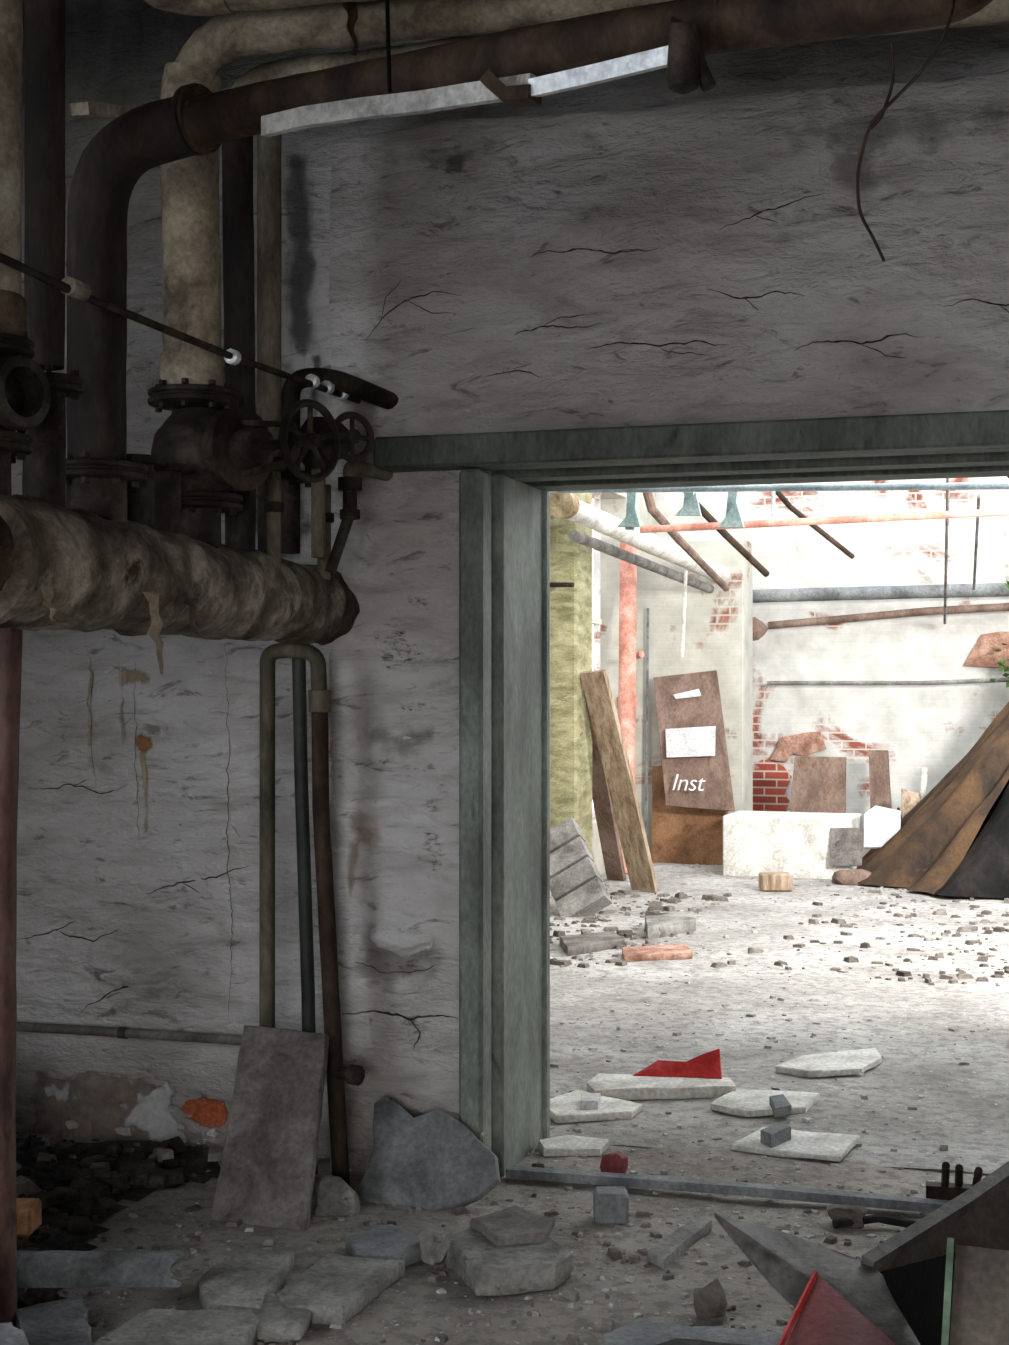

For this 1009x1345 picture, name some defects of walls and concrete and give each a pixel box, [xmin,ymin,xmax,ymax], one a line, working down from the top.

crack [719,193,825,230]
water stain [286,156,319,368]
crack [706,289,804,310]
crack [943,298,1009,313]
crack [795,333,915,358]
rust [122,670,149,684]
crack [33,659,139,836]
rust [120,700,152,831]
crack [149,646,248,1024]
crack [21,920,122,942]
crack [341,1010,458,1047]
flaking render [33,1071,228,1147]